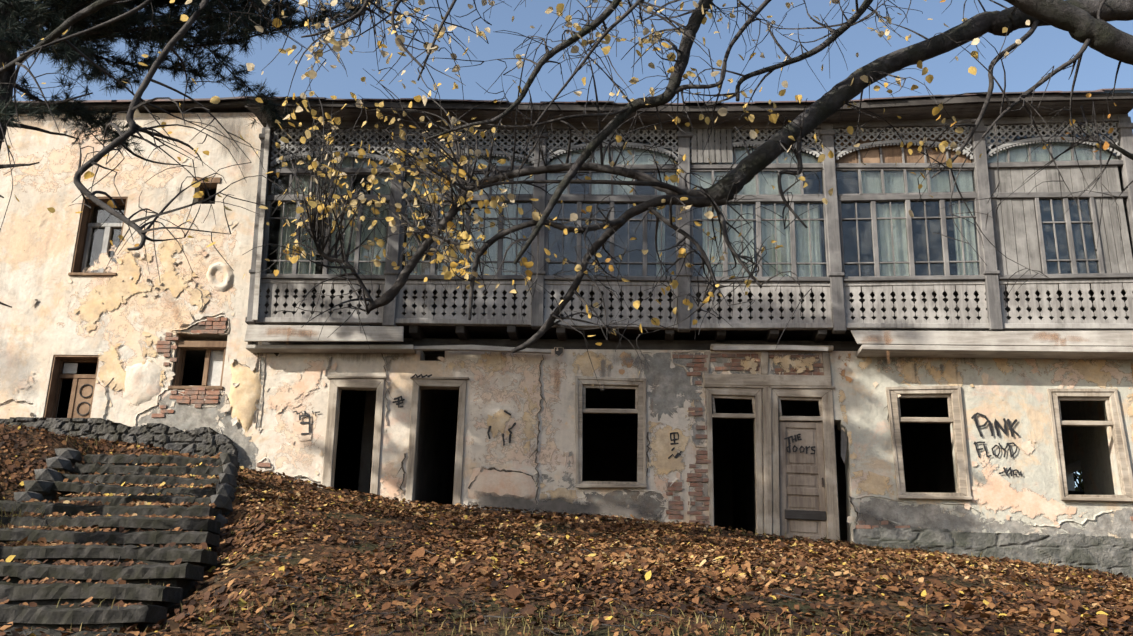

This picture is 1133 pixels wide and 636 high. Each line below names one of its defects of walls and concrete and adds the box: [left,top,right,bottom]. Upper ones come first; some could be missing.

peeling [57,209,337,475]
crack [468,354,547,502]
flaking render [436,347,824,525]
flaking render [838,353,1133,538]